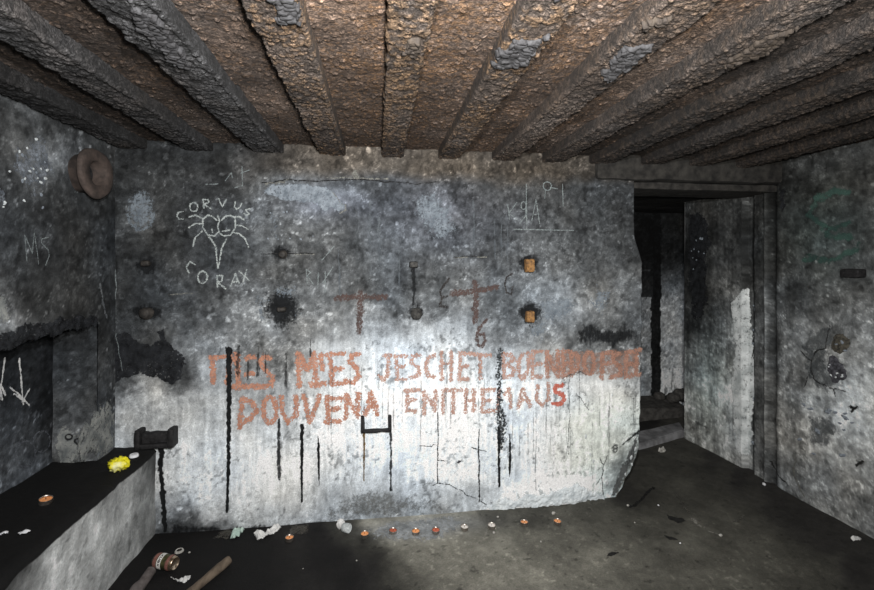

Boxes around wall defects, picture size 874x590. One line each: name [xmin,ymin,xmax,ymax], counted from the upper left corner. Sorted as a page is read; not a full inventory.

spalling [0,297,99,351]
spalling [827,334,851,383]